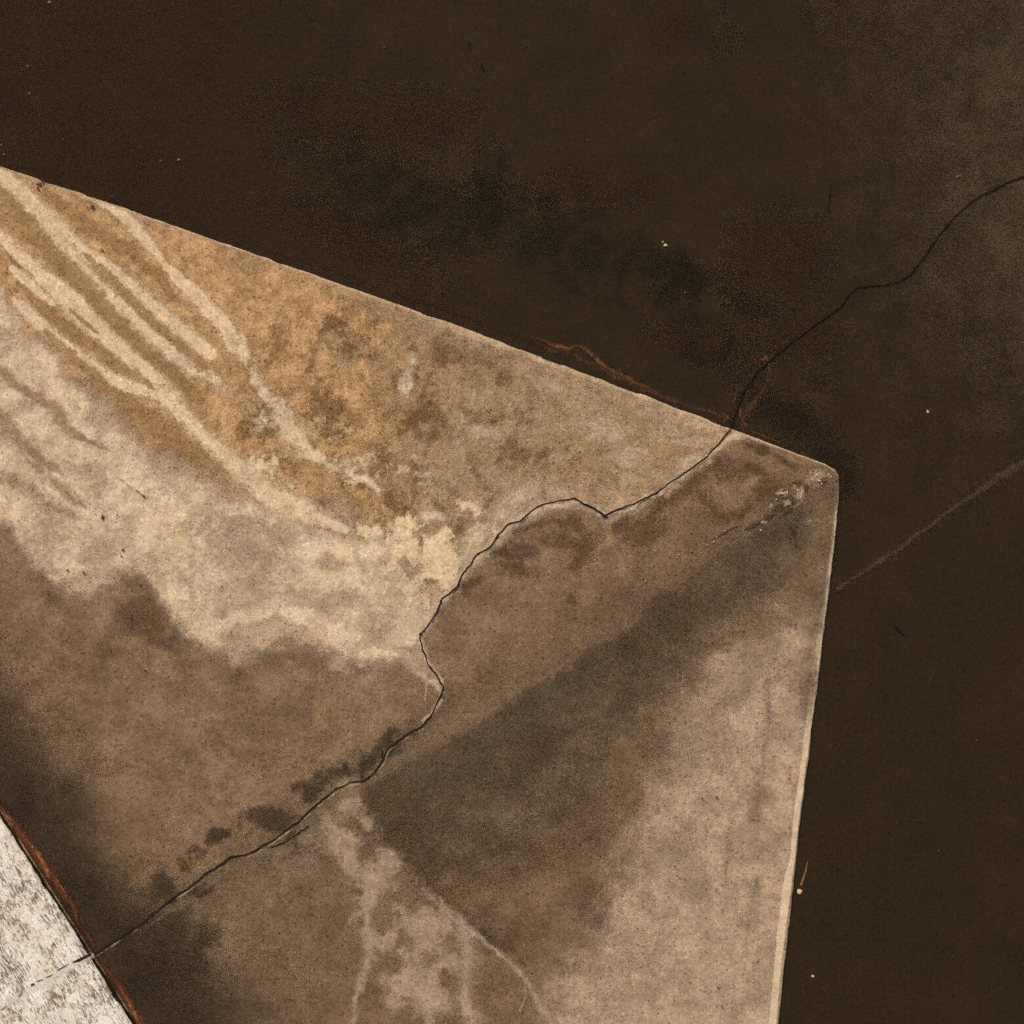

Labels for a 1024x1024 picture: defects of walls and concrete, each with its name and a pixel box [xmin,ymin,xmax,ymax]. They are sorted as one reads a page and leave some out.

corrosion [537,338,763,433]
water stain [0,168,838,1024]
crack [18,176,1024,997]
corrosion [0,803,95,950]
corrosion [101,964,145,1024]